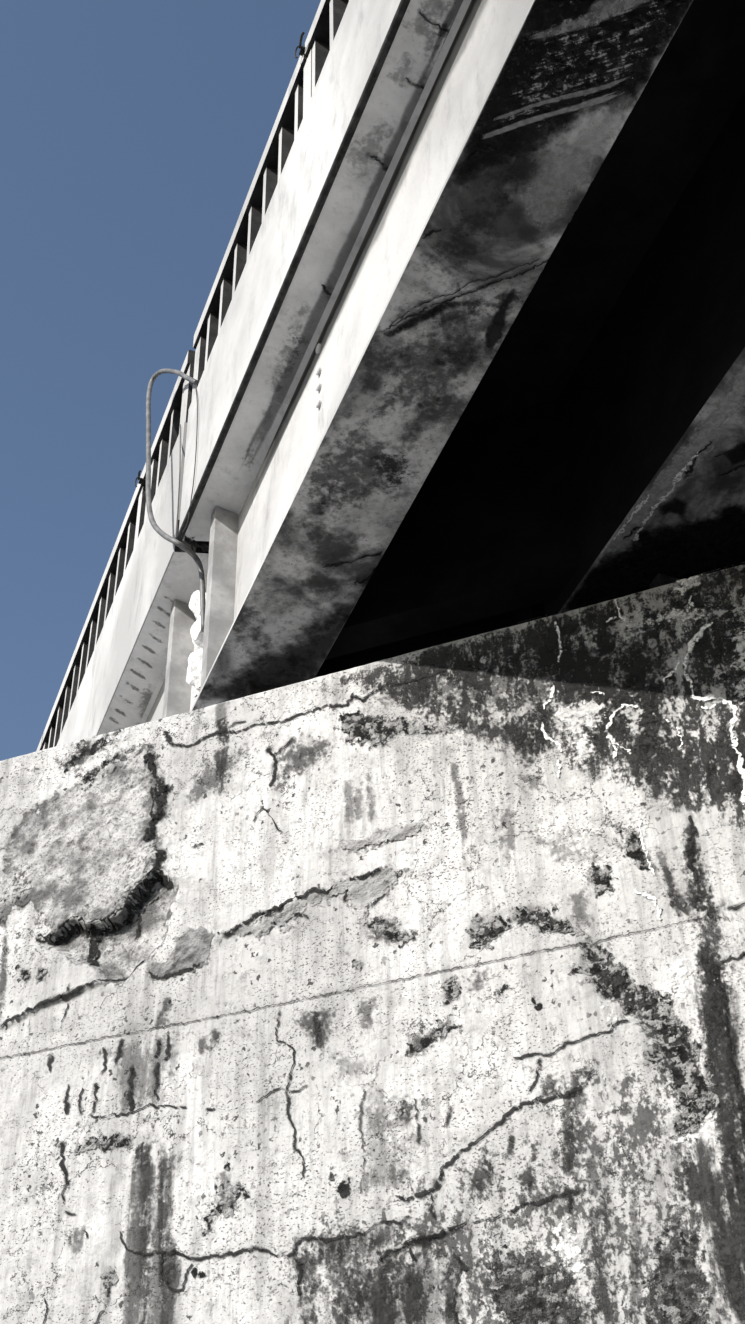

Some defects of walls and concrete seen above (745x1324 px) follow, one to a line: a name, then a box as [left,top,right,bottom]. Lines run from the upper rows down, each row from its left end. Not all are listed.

leakage [271,0,475,446]
leakage [200,578,370,701]
spalling [0,729,238,987]
leakage [276,733,327,789]
spalling [363,916,427,948]
leakage [292,365,745,1324]
crack [687,815,698,880]
crack [58,1142,75,1215]
leakage [123,1144,181,1324]
crack [90,1103,215,1118]
crack [120,1012,628,1324]
crack [713,951,745,1135]